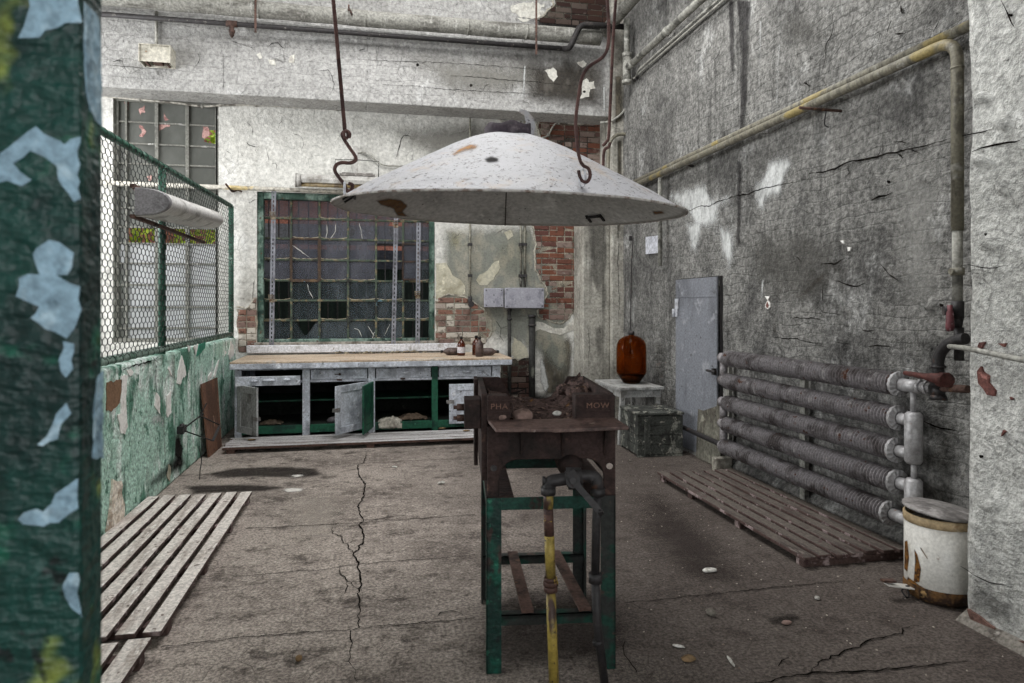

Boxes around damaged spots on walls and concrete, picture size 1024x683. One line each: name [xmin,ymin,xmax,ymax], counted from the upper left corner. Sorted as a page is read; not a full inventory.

flaking render [510,0,607,26]
peeling [18,0,102,127]
peeling [0,127,81,202]
flaking render [536,122,600,164]
crack [689,128,1020,211]
peeling [16,240,82,377]
flaking render [435,261,500,345]
flaking render [531,226,574,335]
peeling [92,369,134,459]
peeling [977,366,997,396]
crack [162,457,475,683]
crack [756,625,965,683]